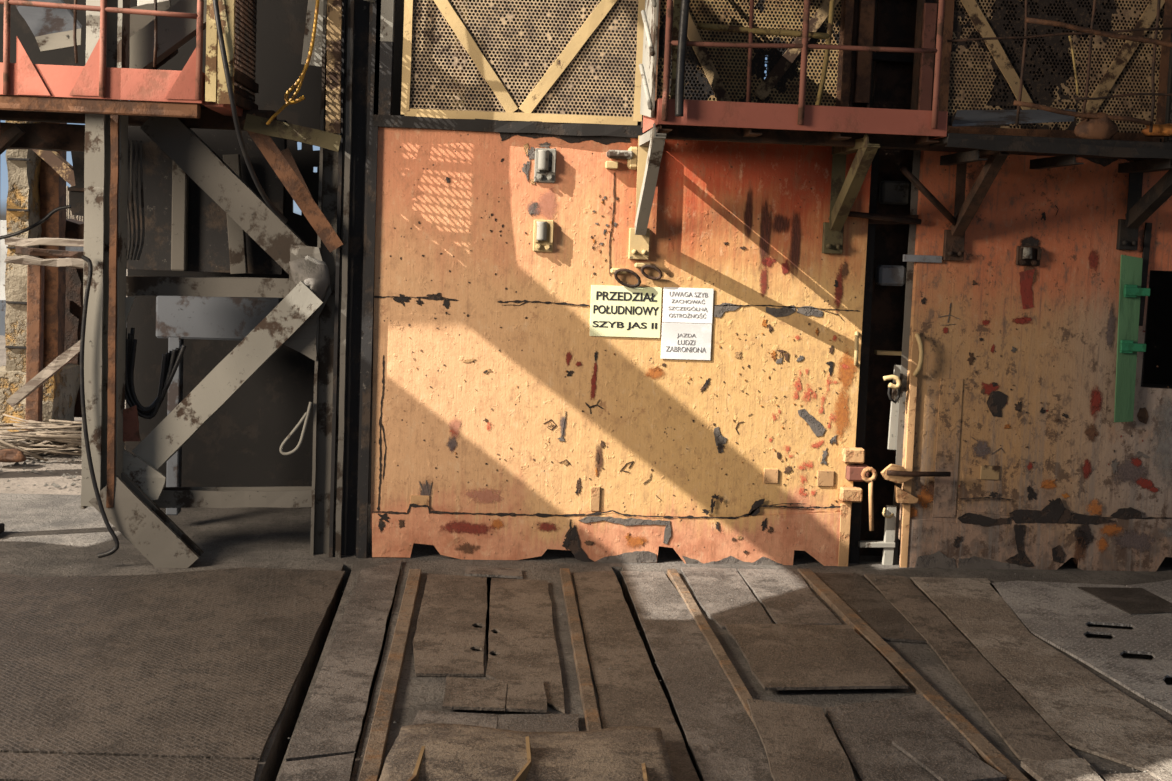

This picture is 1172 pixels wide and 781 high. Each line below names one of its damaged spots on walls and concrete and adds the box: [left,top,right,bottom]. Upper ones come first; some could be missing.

corrosion [1021,236,1041,246]
corrosion [1012,266,1038,324]
peeling [762,305,823,336]
peeling [687,333,848,496]
peeling [967,352,1070,434]
peeling [1137,407,1149,424]
peeling [1108,435,1158,502]
peeling [562,516,671,563]
peeling [702,494,724,531]
peeling [682,536,782,565]
peeling [748,499,773,534]
peeling [915,485,1142,570]